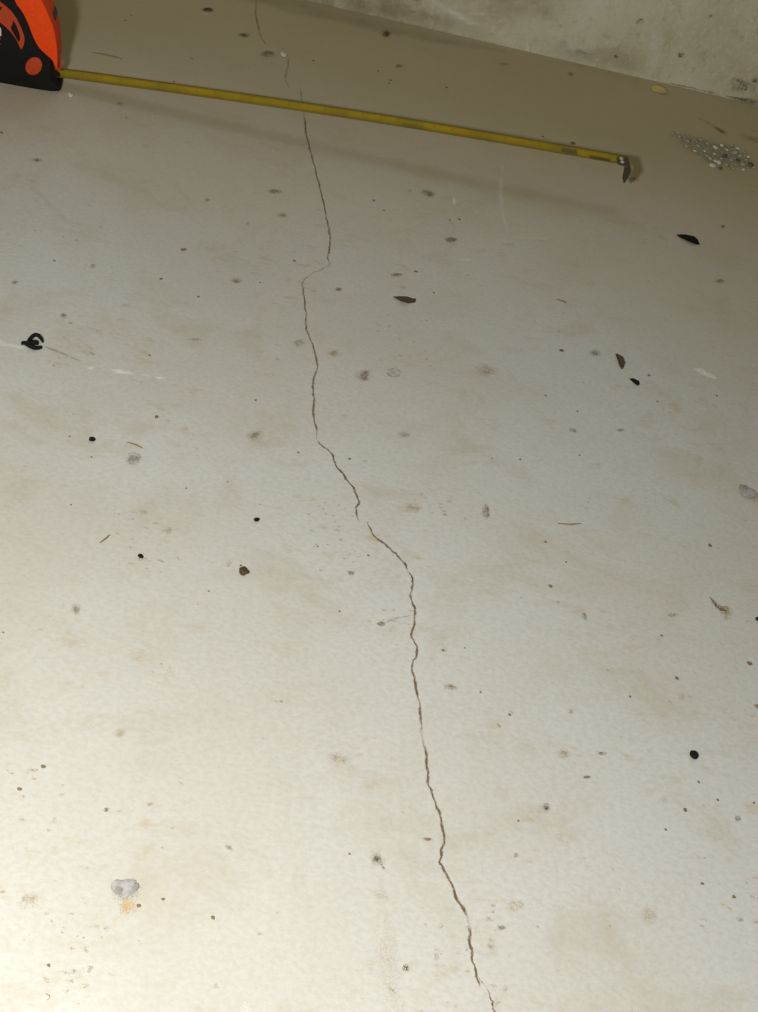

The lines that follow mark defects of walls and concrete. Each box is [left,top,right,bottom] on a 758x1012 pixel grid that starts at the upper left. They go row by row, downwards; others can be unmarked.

crack [284,62,501,1012]